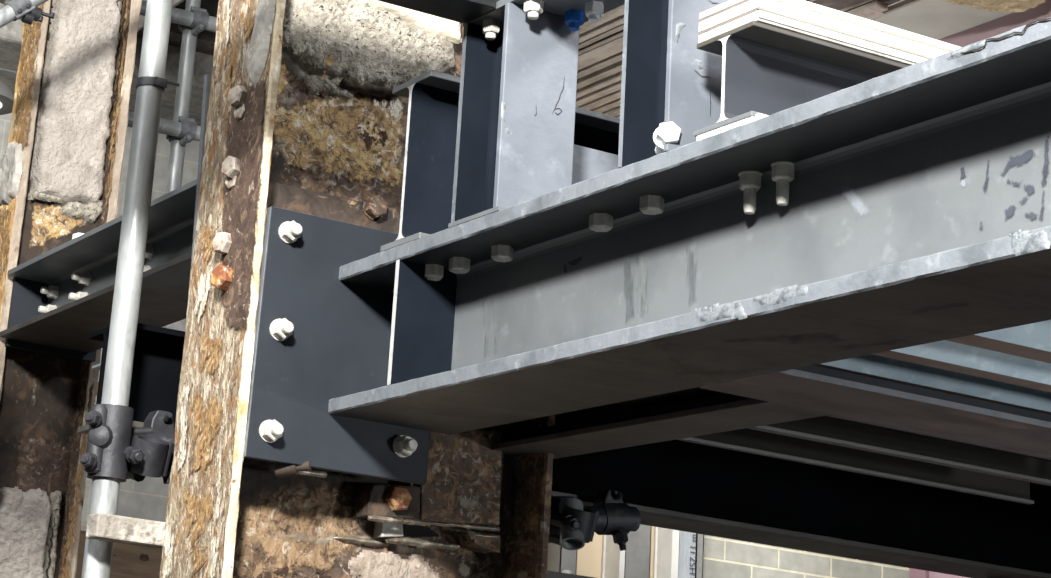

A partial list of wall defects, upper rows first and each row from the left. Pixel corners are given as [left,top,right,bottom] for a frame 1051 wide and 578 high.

rust [201,56,404,330]
peeling [1009,229,1051,256]
peeling [195,266,213,323]
peeling [694,284,808,323]
rust [200,334,222,376]
peeling [178,386,189,470]
peeling [215,426,224,517]
peeling [163,521,174,578]
peeling [209,537,220,578]
spalling [348,546,440,578]